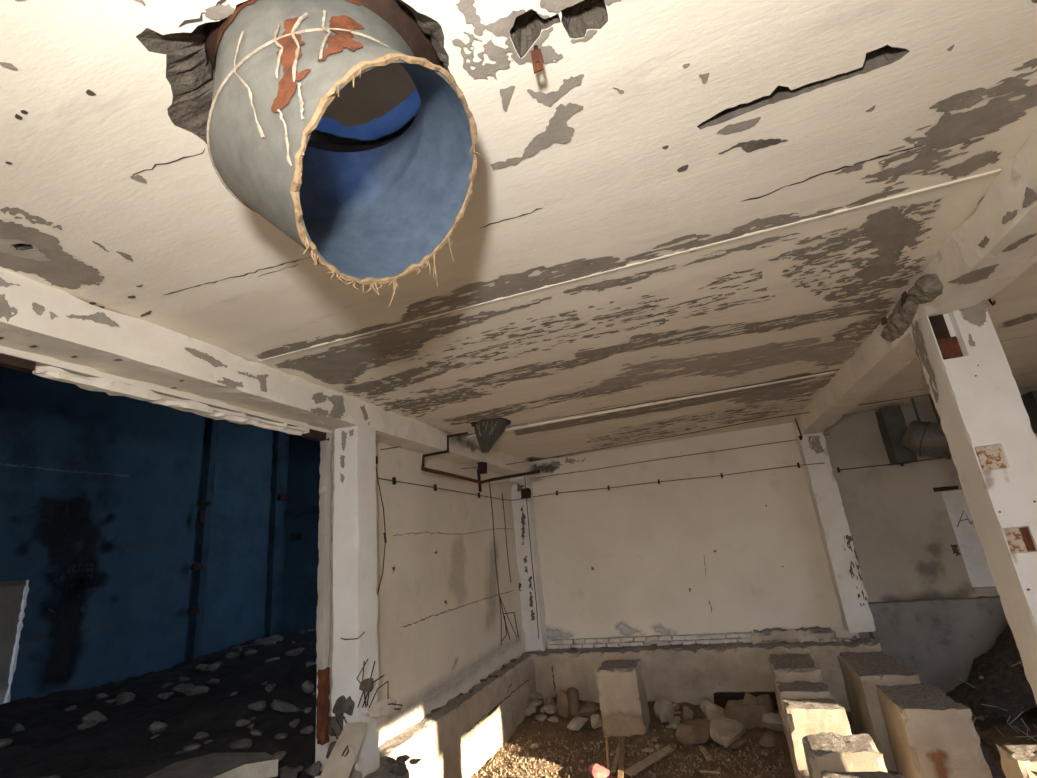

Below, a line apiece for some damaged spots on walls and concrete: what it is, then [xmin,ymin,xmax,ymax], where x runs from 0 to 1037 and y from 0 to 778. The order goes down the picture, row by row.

spalling [136,0,248,144]
rust [214,0,256,69]
rust [271,15,365,113]
crack [131,149,205,179]
peeling [0,207,104,322]
peeling [92,241,133,262]
crack [164,257,310,295]
crack [481,208,542,228]
peeling [185,44,1037,484]
peeling [32,302,120,328]
leakage [19,498,113,686]
rust [931,750,948,778]